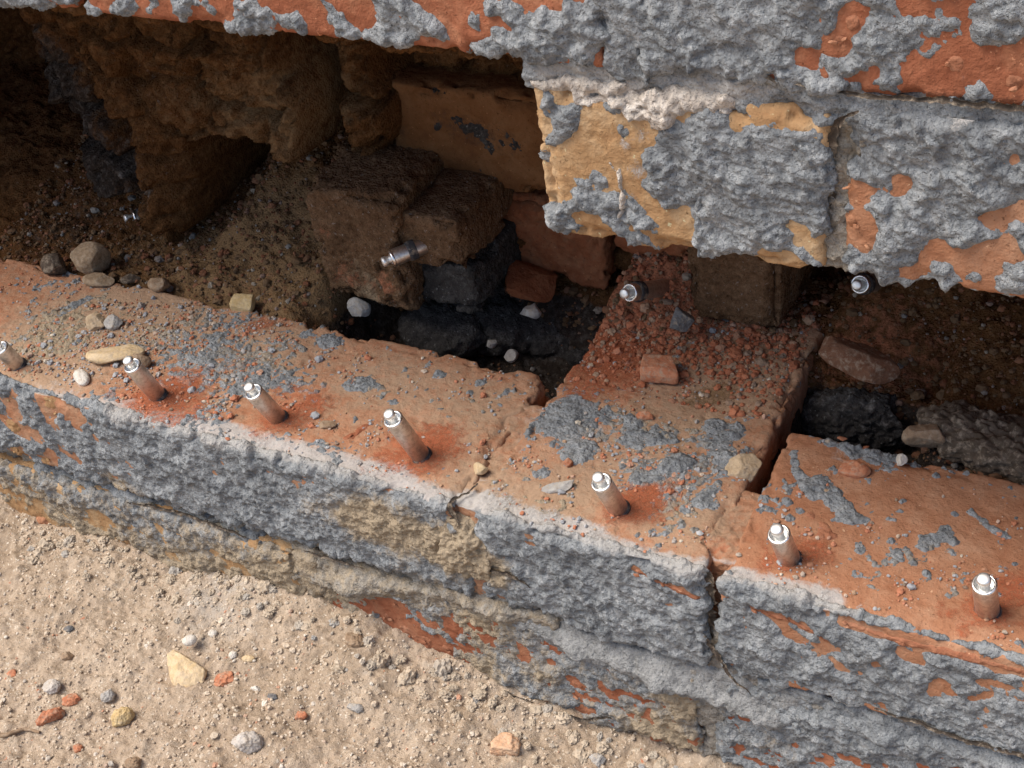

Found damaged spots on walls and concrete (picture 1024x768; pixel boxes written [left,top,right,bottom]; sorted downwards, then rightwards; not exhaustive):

crack [765,75,805,88]
crack [827,91,1024,211]
spalling [373,168,558,314]
spalling [229,293,256,312]
crack [446,483,478,529]
spalling [374,597,452,653]
crack [703,572,751,695]
spalling [750,607,829,645]
spalling [841,621,1024,674]